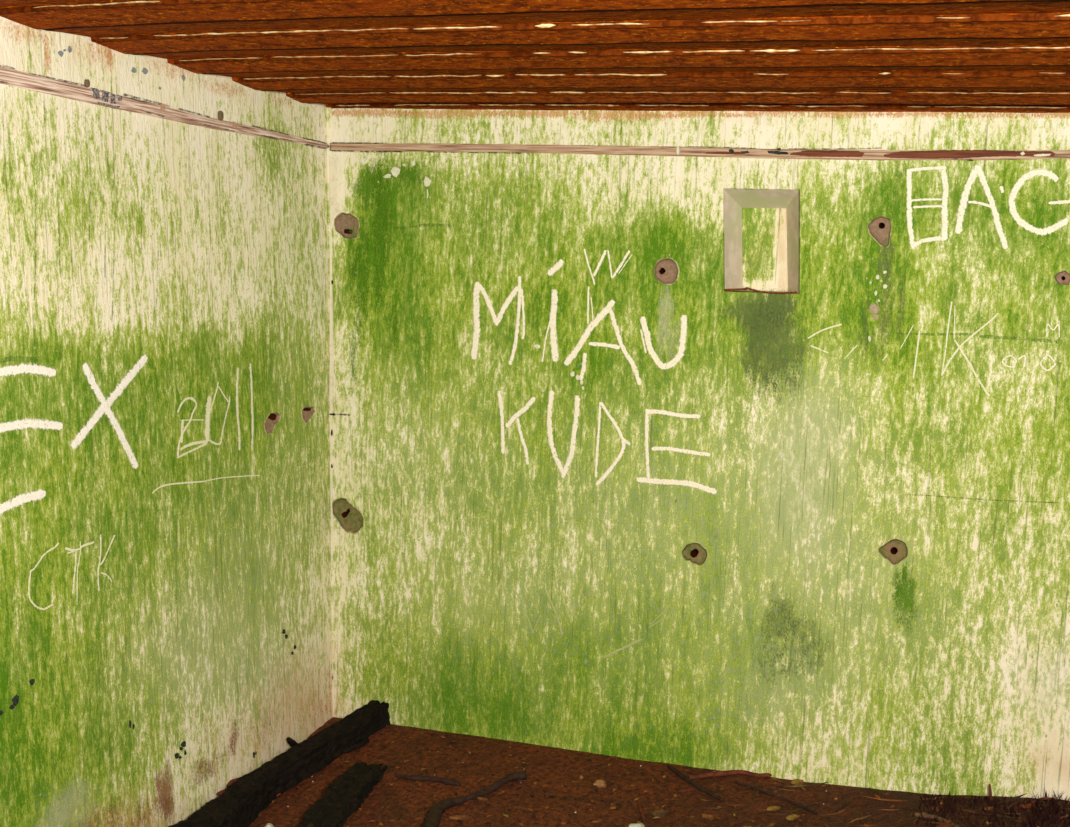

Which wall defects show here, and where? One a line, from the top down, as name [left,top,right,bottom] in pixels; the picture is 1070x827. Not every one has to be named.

water stain [90,87,122,108]
water stain [729,294,805,386]
water stain [894,563,917,628]